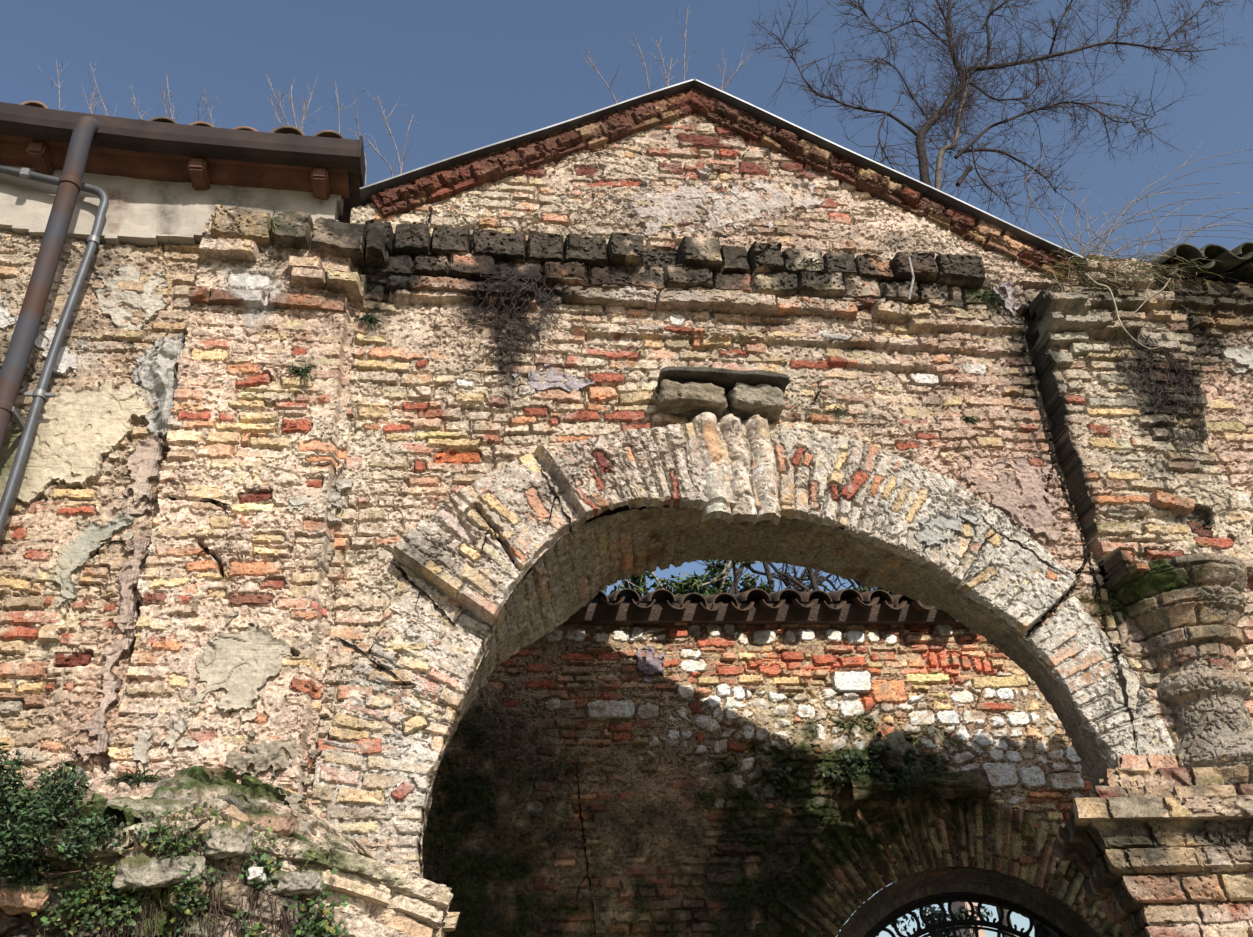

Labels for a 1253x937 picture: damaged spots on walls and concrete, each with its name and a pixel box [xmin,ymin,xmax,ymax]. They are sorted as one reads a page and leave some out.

peeling [0,300,18,330]
peeling [94,263,171,350]
damp [465,252,559,380]
damp [1127,326,1213,435]
peeling [1219,345,1253,376]
peeling [0,319,167,764]
crack [193,542,224,577]
crack [391,562,458,629]
crack [541,468,576,538]
crack [964,316,1139,755]
peeling [132,594,324,764]
crack [335,636,411,686]